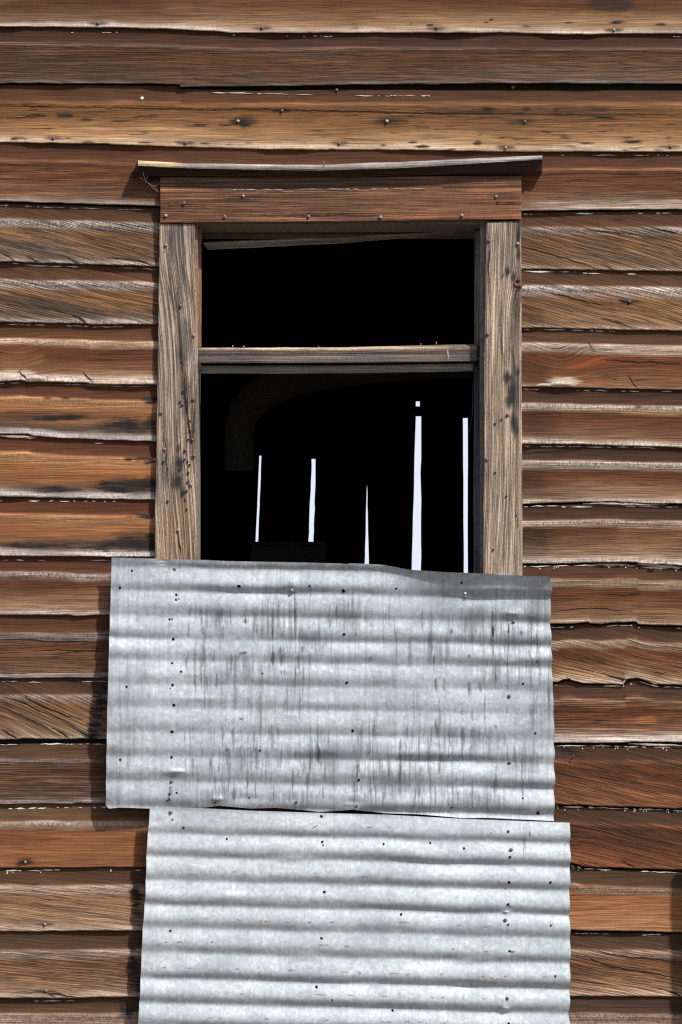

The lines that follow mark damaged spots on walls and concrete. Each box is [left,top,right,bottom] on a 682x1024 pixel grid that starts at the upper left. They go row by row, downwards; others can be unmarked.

crack [561,665,667,683]